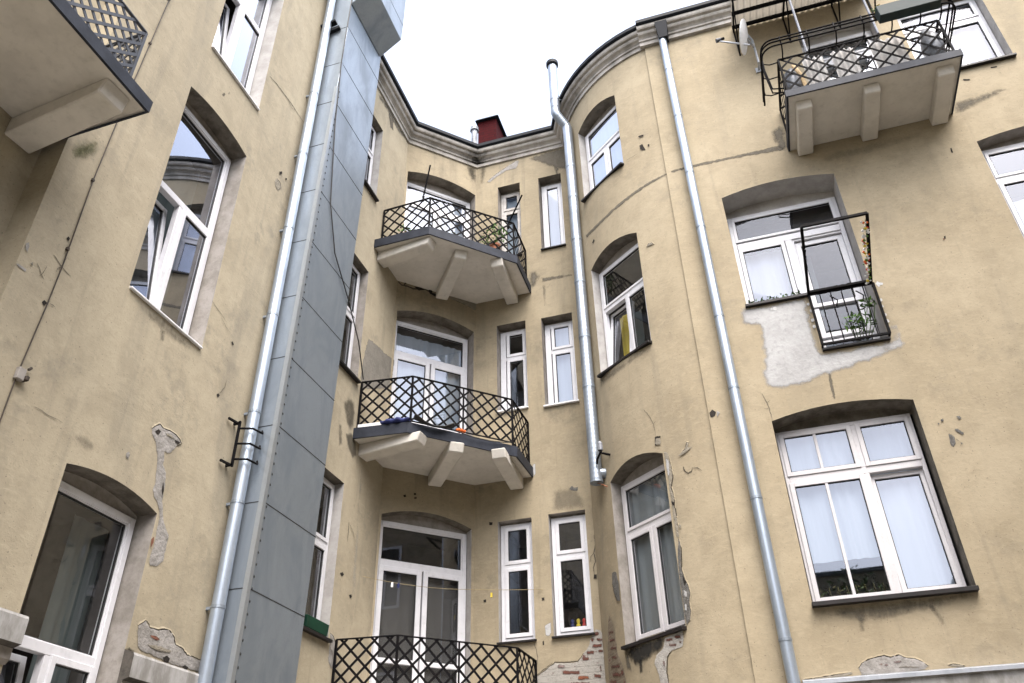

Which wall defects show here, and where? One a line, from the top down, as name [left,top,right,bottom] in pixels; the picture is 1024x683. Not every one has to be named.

peeling [149,422,182,566]
flaking render [654,441,701,683]
flaking render [138,618,201,671]
flaking render [537,616,626,683]
flaking render [803,653,929,680]